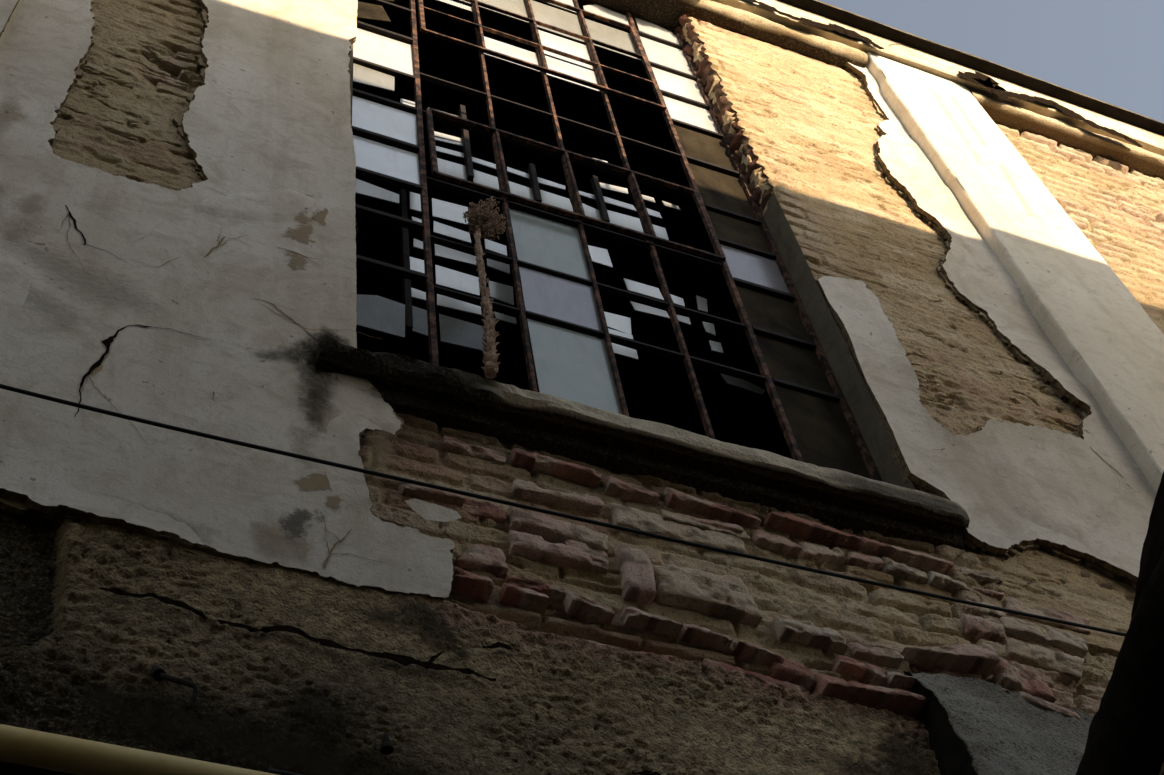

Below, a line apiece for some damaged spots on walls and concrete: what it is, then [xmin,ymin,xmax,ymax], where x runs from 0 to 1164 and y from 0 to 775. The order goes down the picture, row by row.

spalling [50,0,205,191]
crack [58,205,250,272]
spalling [682,17,1082,437]
spalling [996,124,1164,334]
crack [74,324,210,444]
crack [100,587,519,681]
spalling [358,412,1136,721]